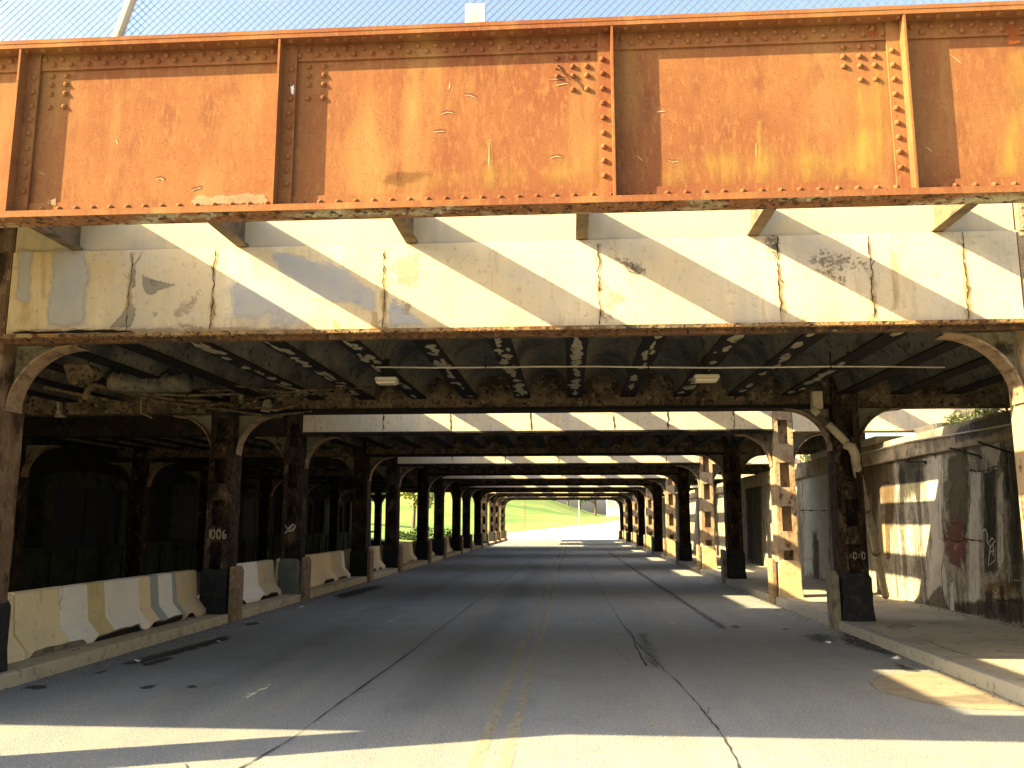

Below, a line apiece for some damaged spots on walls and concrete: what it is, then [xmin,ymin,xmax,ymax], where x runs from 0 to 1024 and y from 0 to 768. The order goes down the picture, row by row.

peeling [191,186,267,205]
crack [13,251,143,334]
spalling [131,267,174,295]
crack [208,250,216,330]
crack [776,236,785,315]
crack [868,236,876,318]
crack [956,233,971,319]
peeling [425,344,473,397]
peeling [494,338,528,396]
peeling [568,337,583,395]
water stain [898,411,1024,623]
crack [580,553,741,768]